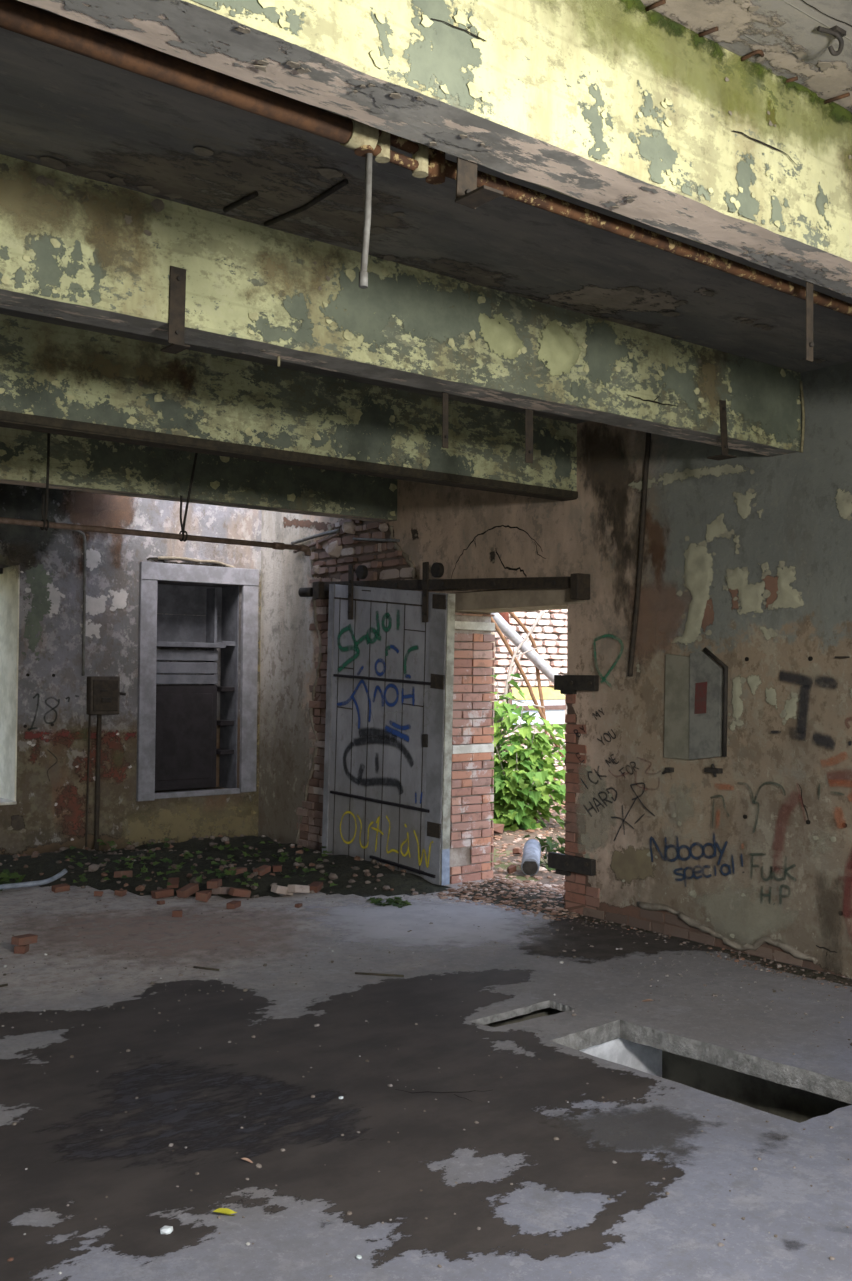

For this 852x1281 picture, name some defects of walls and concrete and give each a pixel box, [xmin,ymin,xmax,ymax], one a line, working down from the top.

peeling [63,0,331,74]
peeling [339,0,488,114]
spalling [641,0,852,112]
peeling [582,74,616,160]
peeling [600,80,792,232]
peeling [816,182,832,231]
peeling [0,228,168,340]
spalling [26,138,688,407]
peeling [0,373,210,487]
peeling [241,394,480,477]
water stain [580,425,640,624]
water stain [0,969,702,1281]